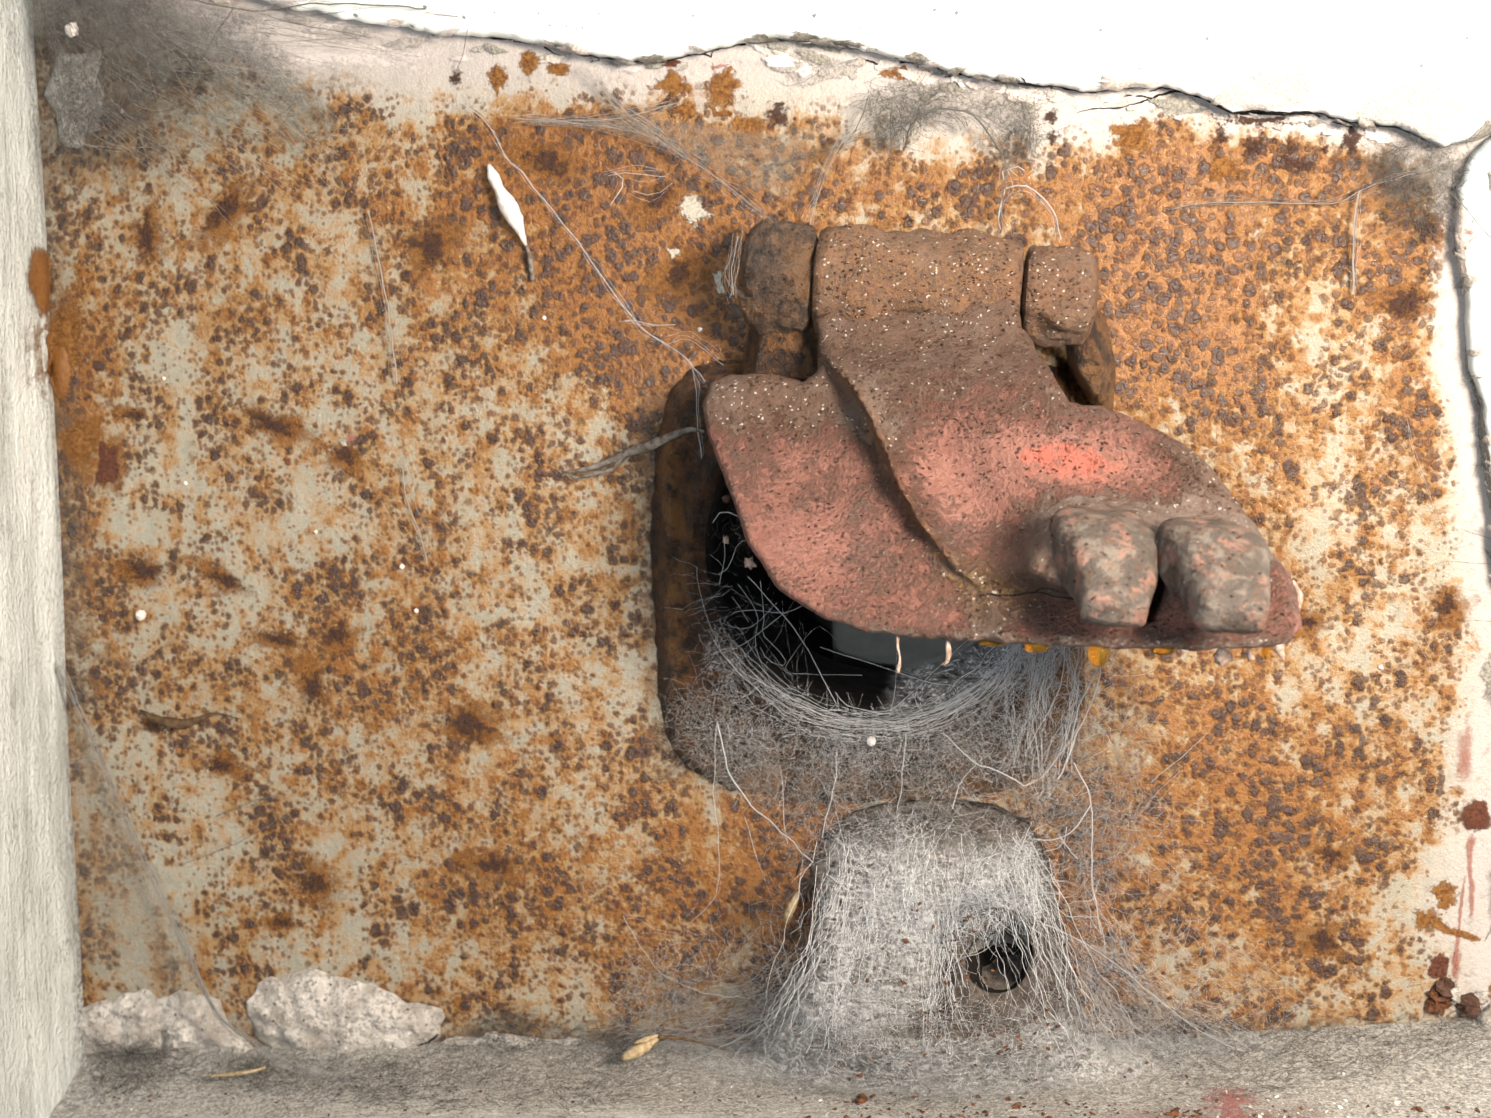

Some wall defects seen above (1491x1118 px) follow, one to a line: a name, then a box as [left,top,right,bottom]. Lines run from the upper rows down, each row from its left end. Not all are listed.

corrosion [486,50,570,95]
crack [471,36,750,63]
corrosion [647,60,796,145]
peeling [744,31,1071,132]
crack [779,59,1438,147]
corrosion [1109,116,1150,155]
corrosion [1208,114,1365,182]
spalling [1094,71,1491,143]
peeling [1445,192,1479,296]
peeling [1463,375,1485,408]
peeling [1477,435,1491,493]
corrosion [1413,800,1491,942]